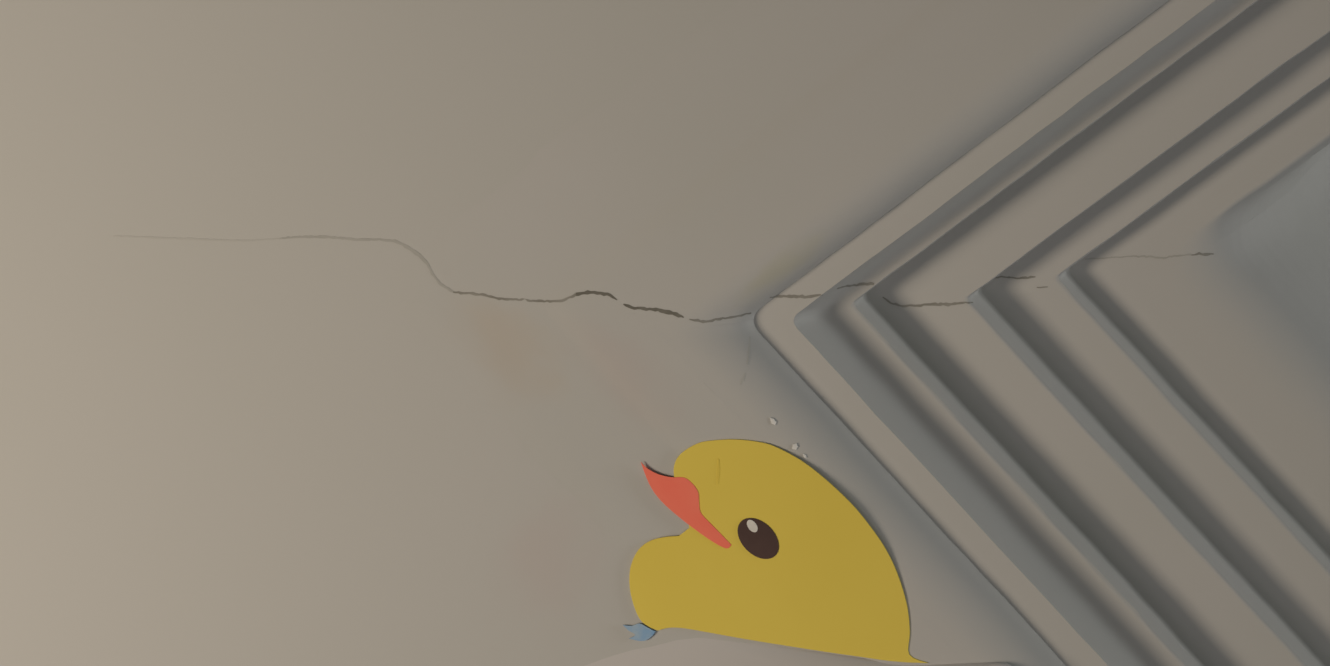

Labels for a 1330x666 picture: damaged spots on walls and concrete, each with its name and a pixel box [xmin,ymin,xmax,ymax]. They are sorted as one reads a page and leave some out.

crack [1085,252,1214,260]
crack [114,235,973,323]
crack [996,276,1048,288]